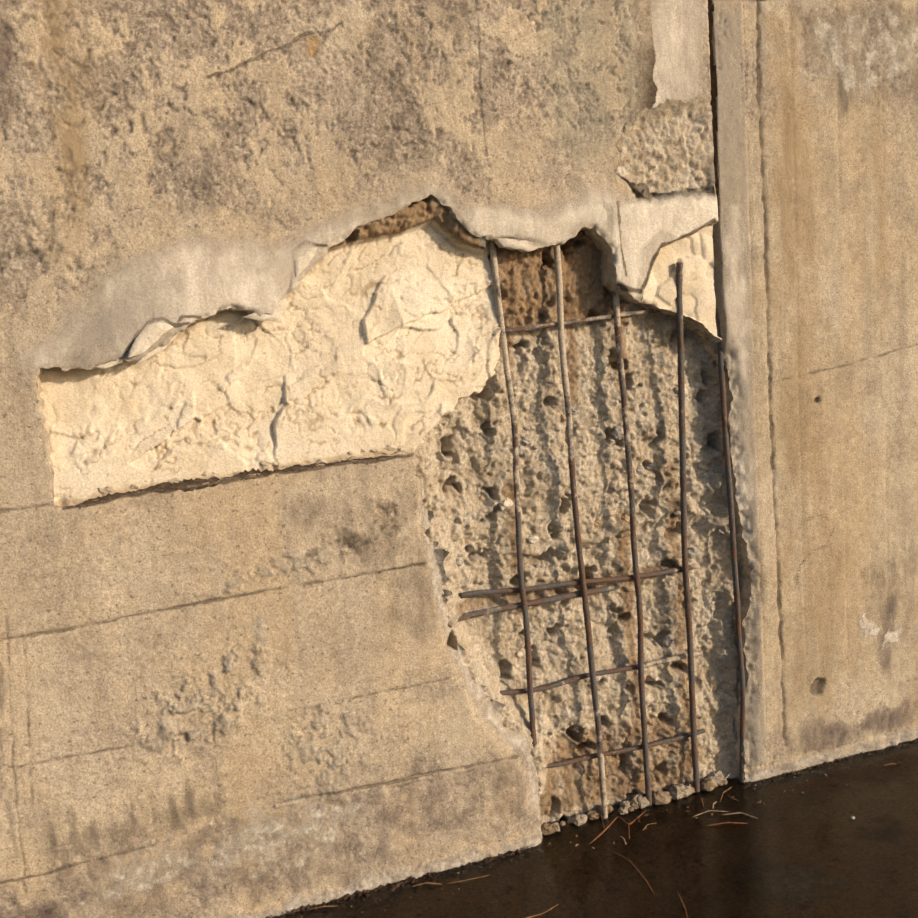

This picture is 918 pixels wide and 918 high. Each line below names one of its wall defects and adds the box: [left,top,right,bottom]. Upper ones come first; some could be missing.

damp [711,12,743,166]
corrosion [488,230,627,392]
spalling [29,0,752,825]
crack [7,622,75,660]
crack [165,588,279,610]
corrosion [547,573,638,670]
damp [859,613,900,643]
corrosion [542,714,699,814]
damp [744,703,918,786]
damp [113,853,194,892]
damp [211,804,361,866]
damp [229,834,543,918]